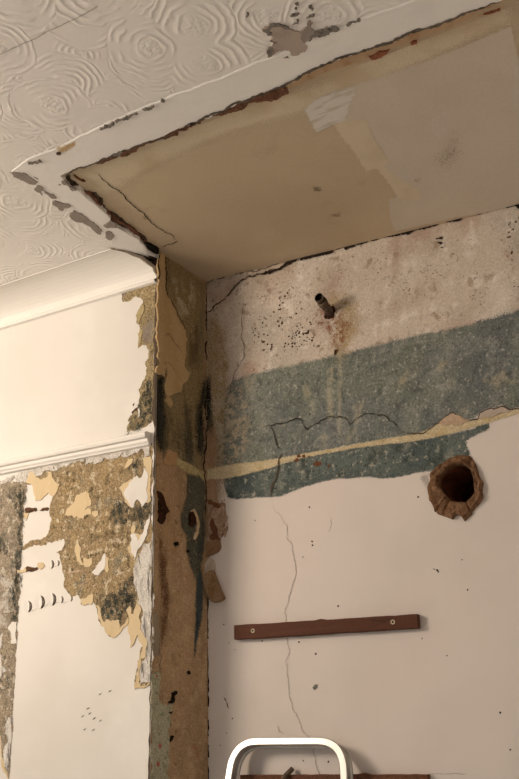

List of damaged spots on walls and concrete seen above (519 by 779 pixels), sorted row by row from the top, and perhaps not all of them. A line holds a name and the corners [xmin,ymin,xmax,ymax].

crack [0,6,98,54]
peeling [262,2,361,58]
peeling [100,98,165,130]
peeling [10,159,117,241]
crack [97,173,178,247]
rust [313,288,365,363]
crack [206,213,482,399]
flaking render [207,206,519,468]
flaking render [0,446,150,487]
leakage [126,256,232,657]
peeling [23,593,73,612]
crack [263,406,519,774]